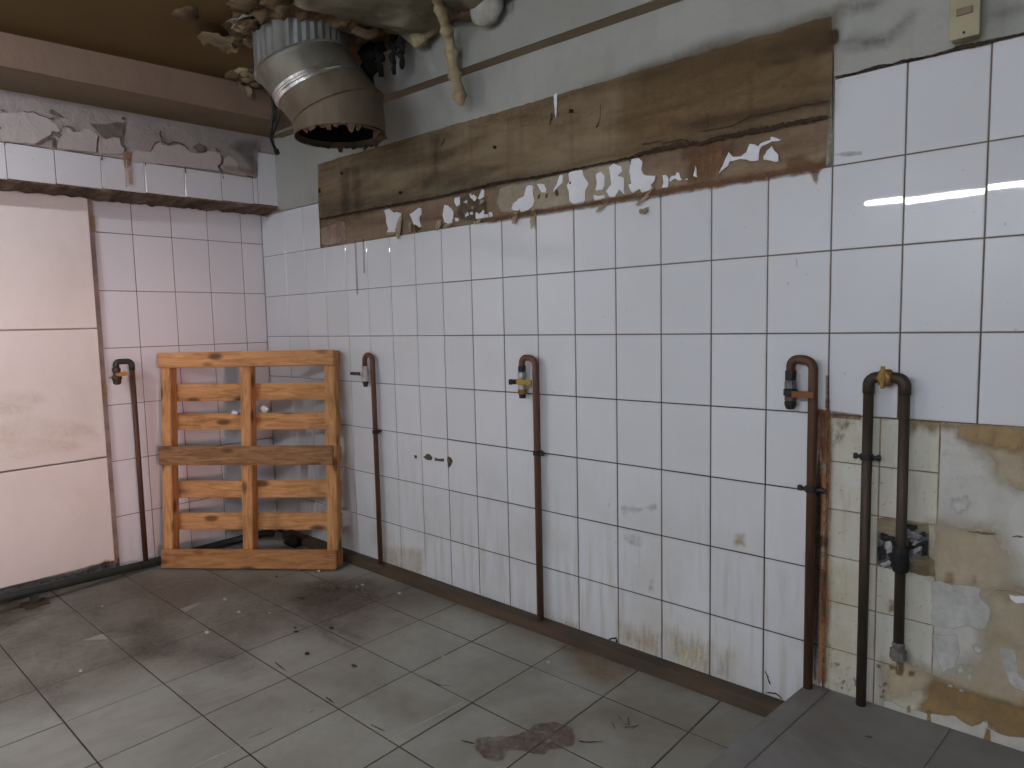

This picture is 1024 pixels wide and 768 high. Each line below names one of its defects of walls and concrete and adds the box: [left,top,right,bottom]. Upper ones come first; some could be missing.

peeling [197,32,252,55]
peeling [291,0,484,44]
peeling [0,109,246,175]
rust [813,376,860,684]
peeling [877,517,990,692]
peeling [1000,647,1024,691]